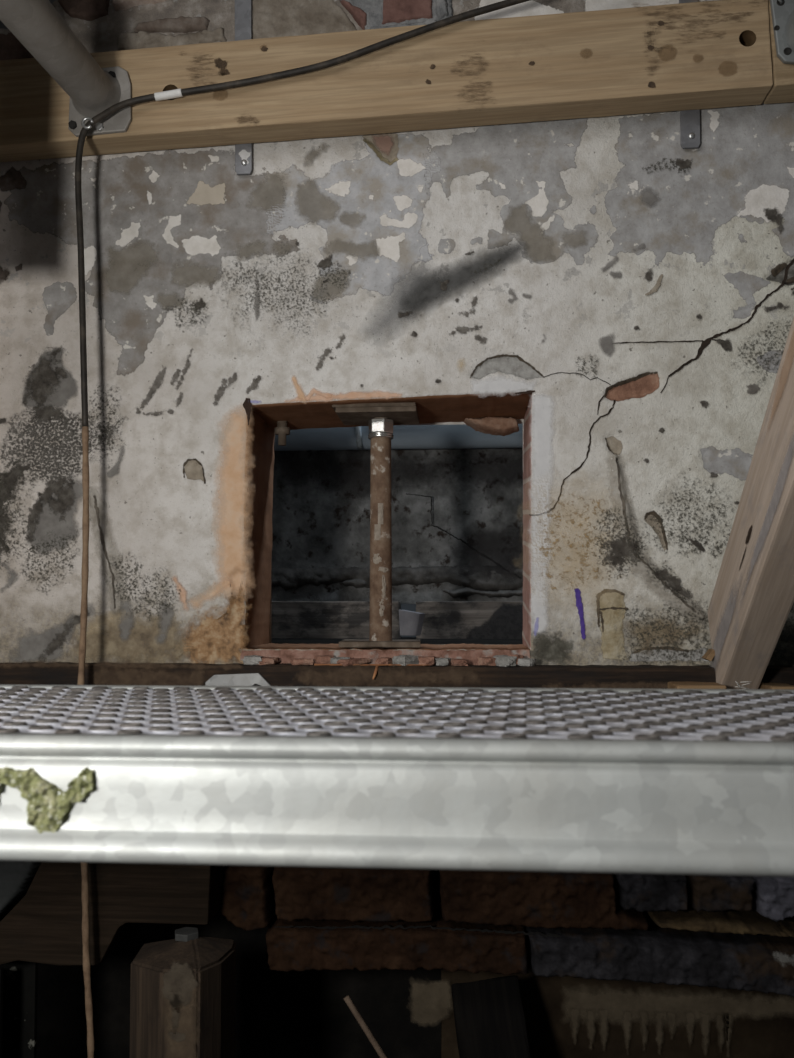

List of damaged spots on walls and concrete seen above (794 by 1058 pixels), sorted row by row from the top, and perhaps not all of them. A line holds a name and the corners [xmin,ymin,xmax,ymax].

flaking render [58,0,110,21]
flaking render [134,16,210,33]
spalling [340,0,453,30]
peeling [0,102,794,376]
flaking render [470,354,659,401]
crack [613,259,794,393]
damp [0,348,123,590]
flaking render [183,459,206,484]
crack [529,395,615,516]
corrosion [173,413,248,664]
damp [13,557,184,663]
damp [773,603,794,666]